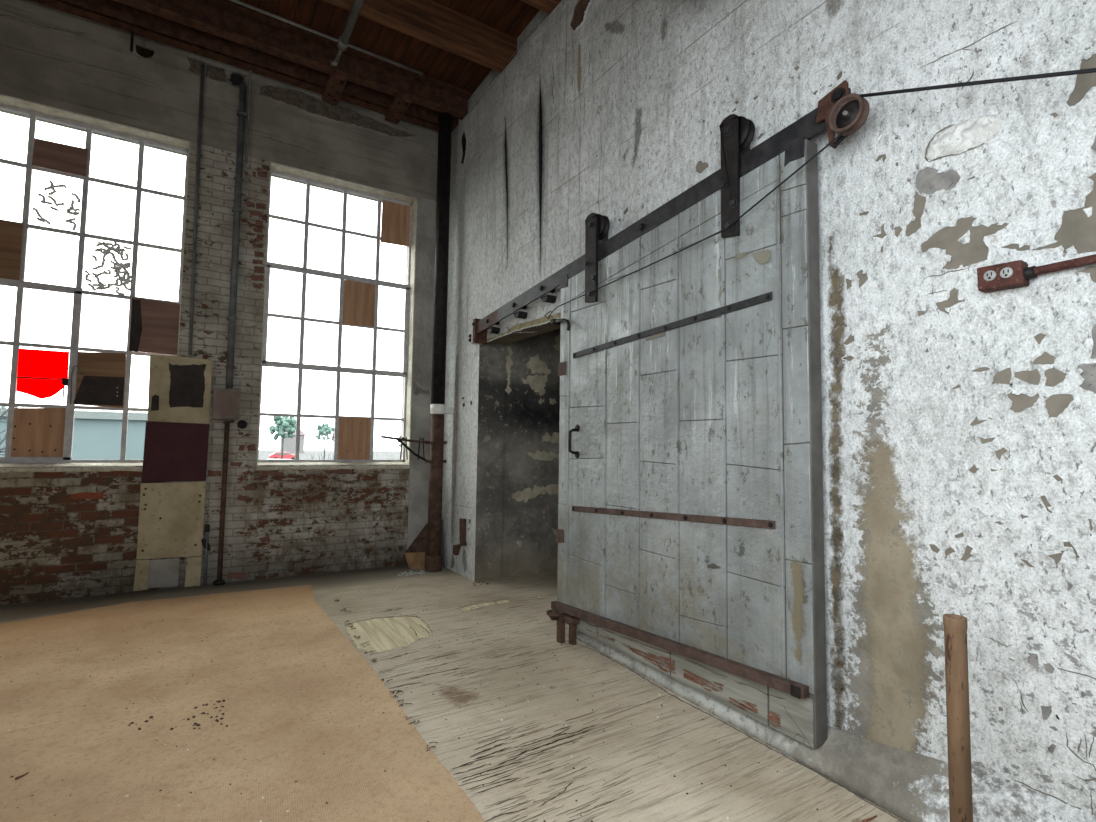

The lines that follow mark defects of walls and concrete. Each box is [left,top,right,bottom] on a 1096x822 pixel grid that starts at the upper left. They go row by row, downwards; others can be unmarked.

spalling [570,0,592,33]
crack [467,16,602,237]
peeling [1049,52,1096,121]
peeling [869,129,1096,285]
peeling [845,268,870,292]
peeling [916,285,967,319]
peeling [944,322,1096,420]
water stain [828,236,847,730]
water stain [858,441,936,752]
peeling [841,319,1010,752]
peeling [1046,539,1083,569]
peeling [1038,703,1063,756]